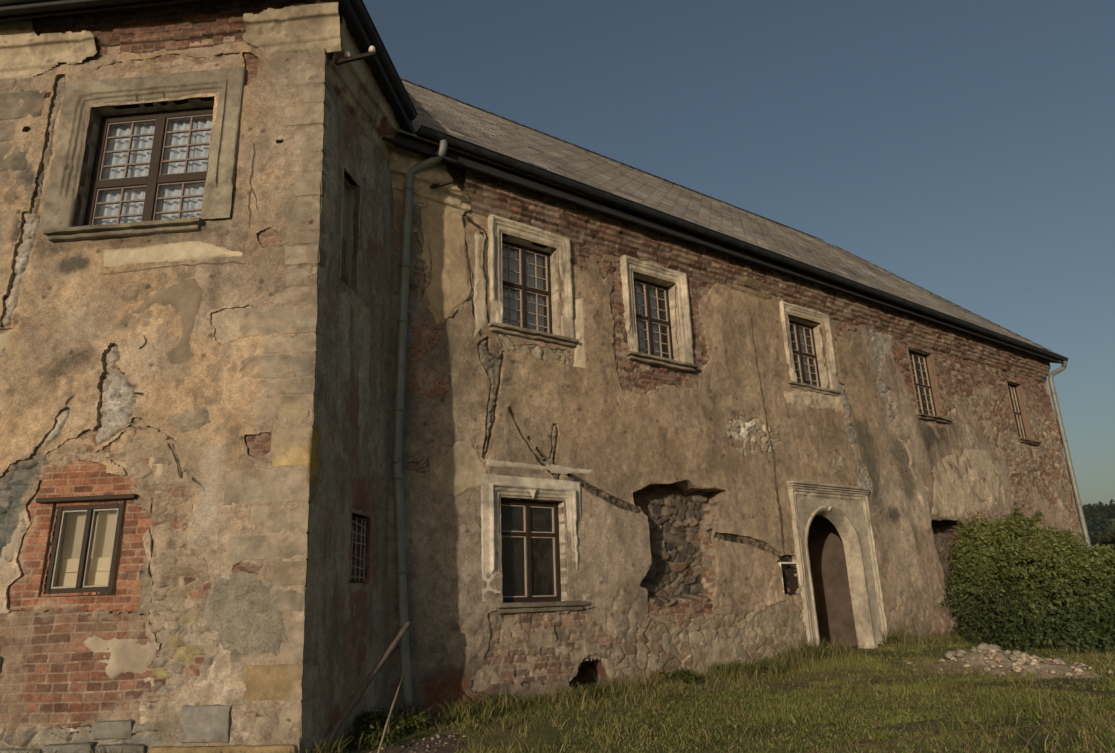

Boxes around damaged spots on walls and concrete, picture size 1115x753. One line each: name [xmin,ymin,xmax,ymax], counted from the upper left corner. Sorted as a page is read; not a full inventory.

flaking render [421,203,489,325]
spalling [96,344,144,444]
crack [462,211,642,513]
crack [838,383,872,502]
flaking render [0,446,167,736]
flaking render [470,607,637,693]